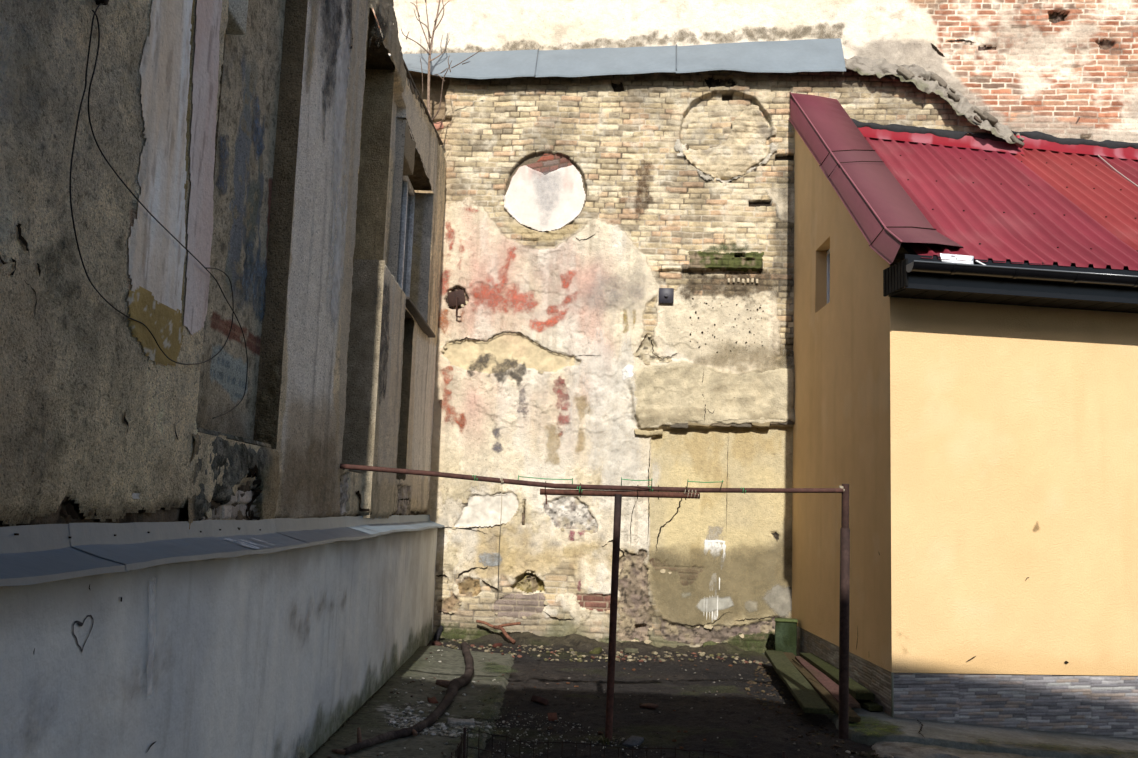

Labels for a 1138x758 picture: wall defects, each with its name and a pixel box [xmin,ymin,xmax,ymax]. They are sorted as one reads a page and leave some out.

spalling [445,286,469,309]
flaking render [441,331,582,374]
spalling [633,334,677,365]
spalling [199,477,260,521]
flaking render [452,492,519,529]
flaking render [543,496,598,534]
crack [602,451,682,556]
spalling [436,594,462,614]
flaking render [494,571,549,619]
flaking render [576,550,779,645]